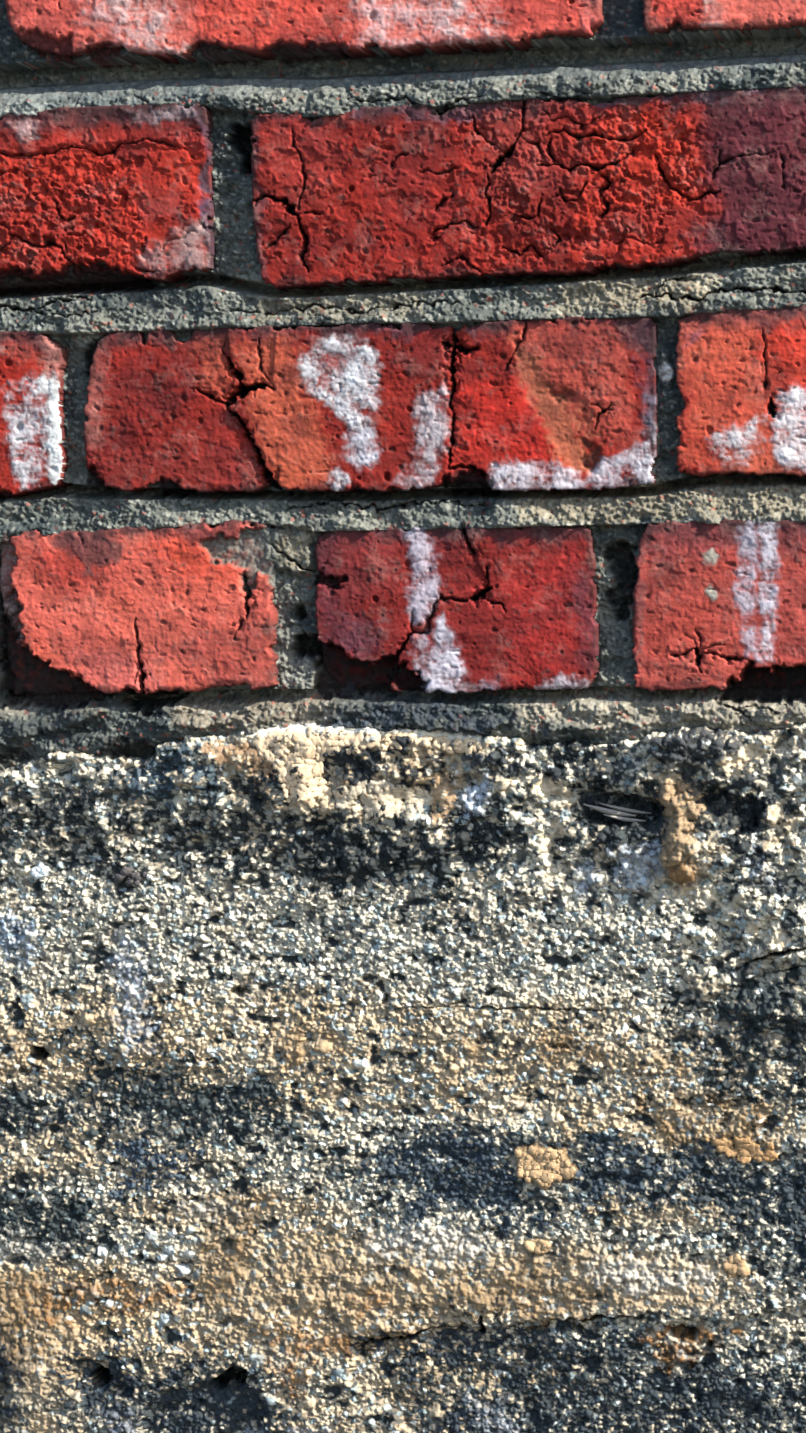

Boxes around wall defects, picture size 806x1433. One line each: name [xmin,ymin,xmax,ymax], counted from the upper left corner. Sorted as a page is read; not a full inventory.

crack [358,91,785,270]
crack [202,138,527,671]
crack [135,626,146,695]
peeling [200,723,490,826]